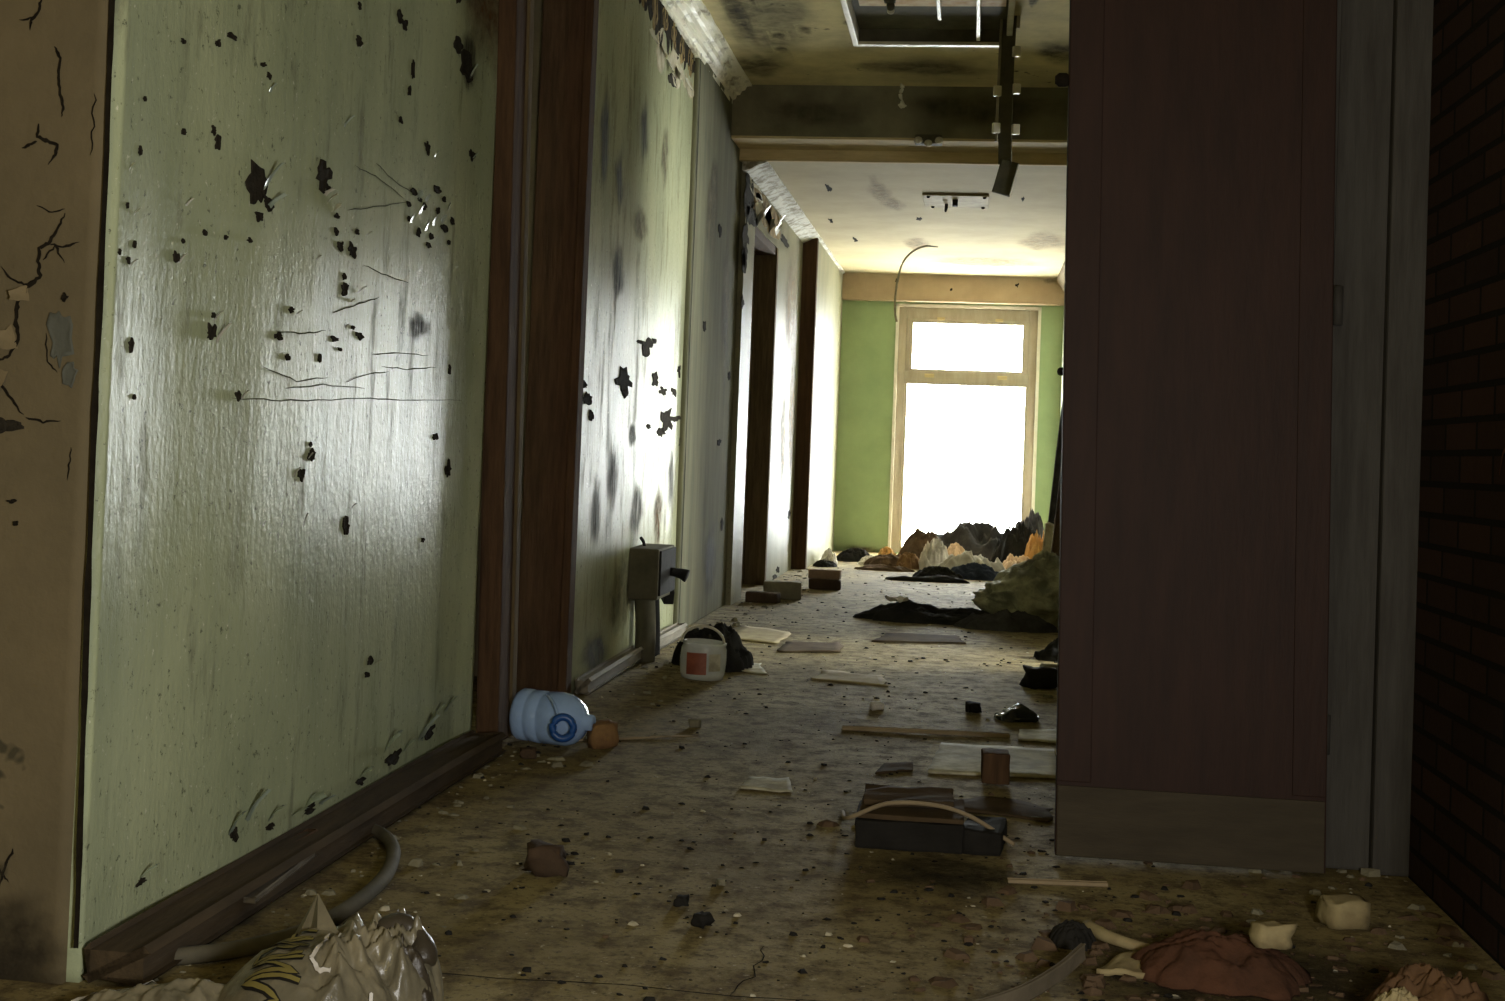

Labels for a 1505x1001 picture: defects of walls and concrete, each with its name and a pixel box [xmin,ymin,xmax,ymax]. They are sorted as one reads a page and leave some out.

spalling [397,9,408,31]
spalling [172,238,188,263]
spalling [245,159,289,243]
spalling [315,159,372,302]
peeling [0,369,59,434]
spalling [583,380,594,421]
spalling [614,366,633,399]
spalling [636,337,681,446]
crack [0,0,115,948]